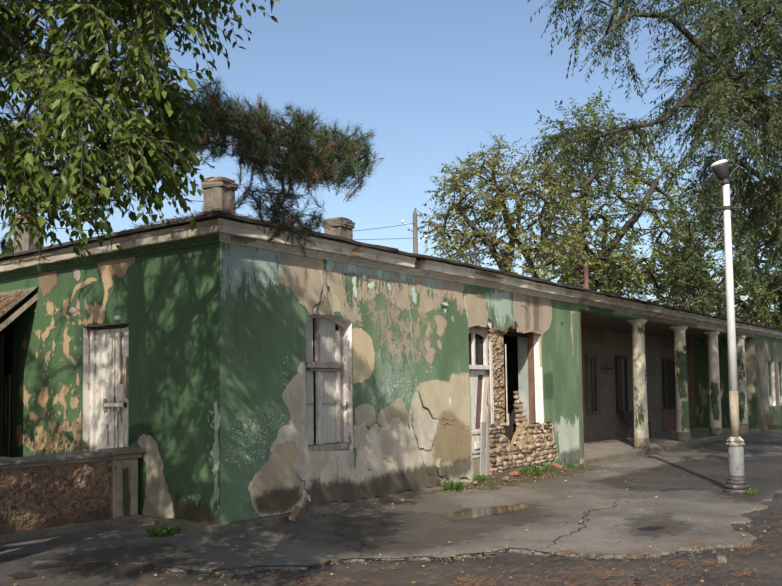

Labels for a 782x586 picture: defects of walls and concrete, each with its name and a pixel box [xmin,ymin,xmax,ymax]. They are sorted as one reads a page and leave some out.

peeling [16,257,135,453]
peeling [207,260,473,517]
leakage [256,459,470,513]
crack [296,391,469,505]
spalling [487,319,580,474]